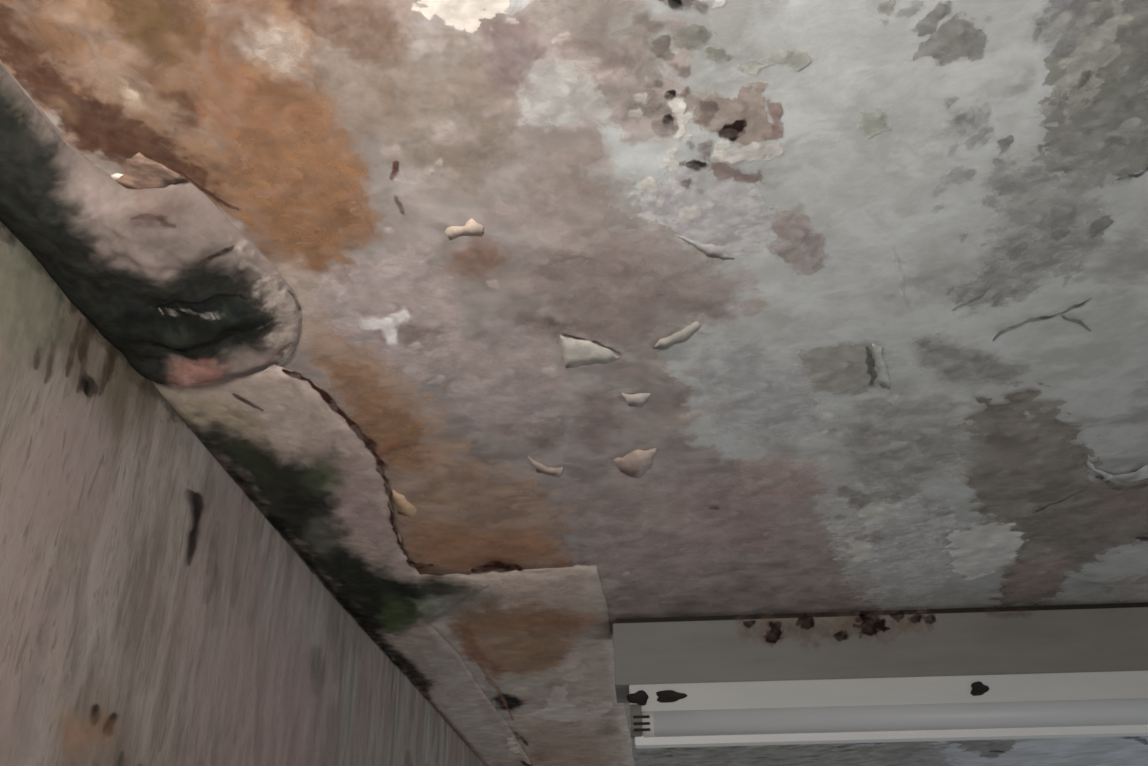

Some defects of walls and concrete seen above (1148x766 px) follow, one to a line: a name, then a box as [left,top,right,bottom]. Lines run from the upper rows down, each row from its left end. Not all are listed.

peeling [878,0,895,15]
peeling [913,1,989,65]
peeling [940,0,1148,309]
damp [0,89,581,699]
flaking render [151,0,891,766]
crack [282,369,433,569]
peeling [916,338,1148,607]
crack [471,561,523,572]
corrosion [744,620,782,643]
corrosion [796,613,814,629]
corrosion [833,611,936,641]
peeling [635,736,1148,766]